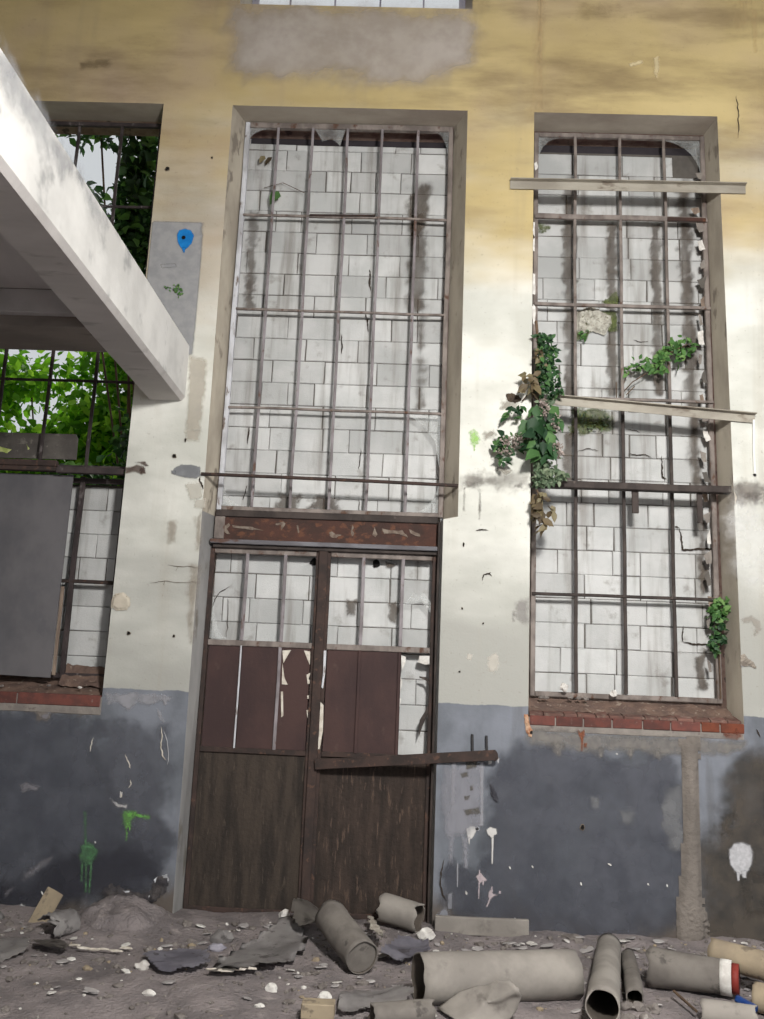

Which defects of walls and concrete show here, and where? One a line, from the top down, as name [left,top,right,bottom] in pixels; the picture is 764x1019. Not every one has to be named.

water stain [732,483,764,505]
spalling [524,714,533,737]
water stain [0,693,174,907]